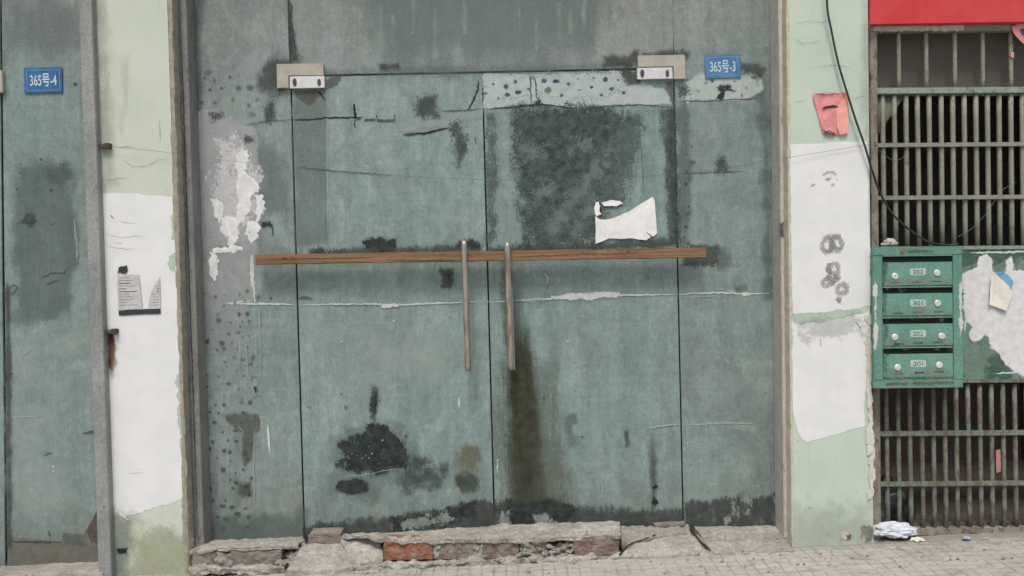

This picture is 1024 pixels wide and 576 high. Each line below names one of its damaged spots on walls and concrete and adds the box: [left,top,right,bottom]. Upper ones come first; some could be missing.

crack [248,80,757,136]
peeling [622,69,639,85]
peeling [665,81,675,105]
peeling [208,149,266,285]
spalling [782,0,878,548]
peeling [958,254,1024,377]
corrosion [108,334,116,369]
water stain [368,388,380,424]
water stain [504,306,563,505]
water stain [389,500,478,531]